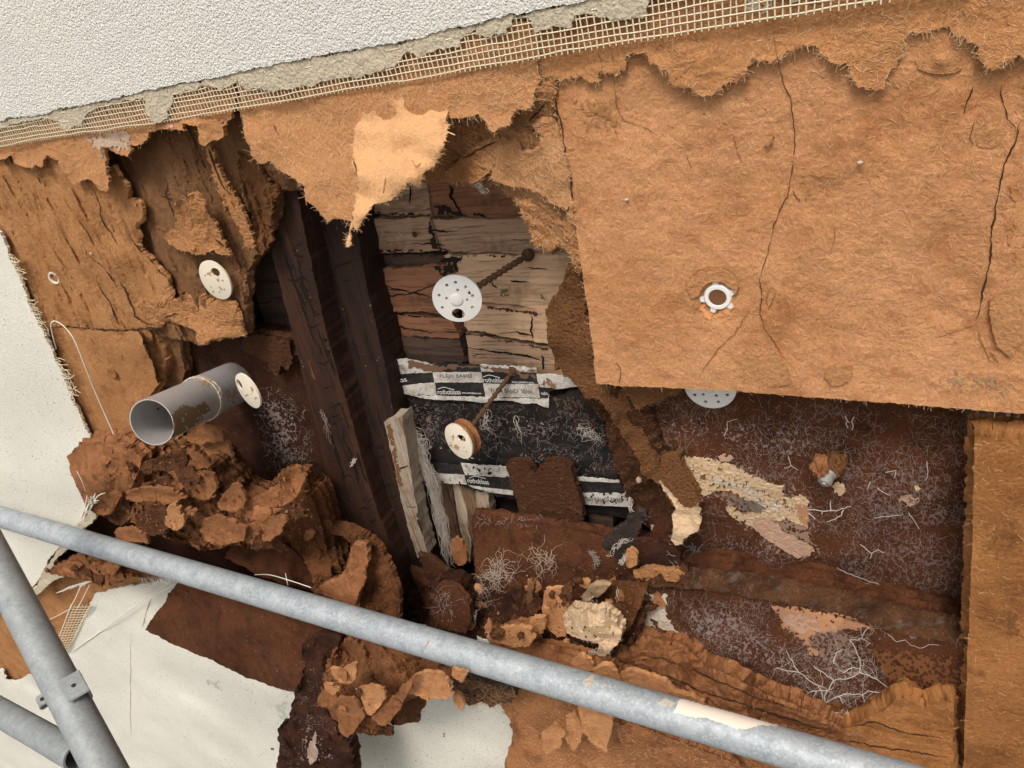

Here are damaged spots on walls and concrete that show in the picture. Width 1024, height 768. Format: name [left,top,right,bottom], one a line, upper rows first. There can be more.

peeling [0,0,1024,247]
crack [702,21,839,372]
crack [939,85,1022,364]
spalling [7,254,92,437]
spalling [241,328,298,377]
mould [497,417,602,478]
spalling [545,259,704,539]
mould [663,418,823,460]
spalling [59,604,92,652]
peeling [64,558,105,587]
mould [683,602,814,689]
mould [822,456,963,596]